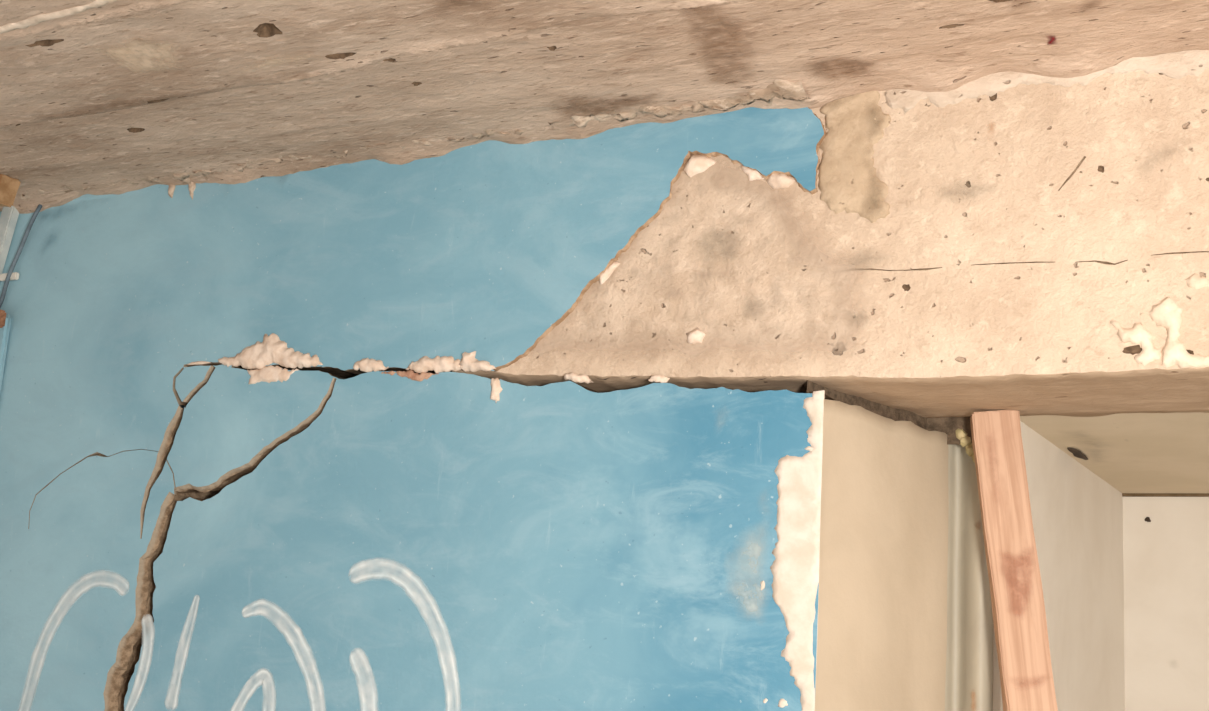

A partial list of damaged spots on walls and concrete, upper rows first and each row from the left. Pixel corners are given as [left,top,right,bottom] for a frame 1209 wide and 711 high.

flaking render [493,113,854,371]
crack [847,265,942,273]
crack [975,259,1049,267]
crack [1079,251,1209,265]
flaking render [187,333,323,384]
crack [564,372,670,393]
spalling [1111,297,1209,369]
crack [28,351,505,711]
peeling [760,390,825,711]